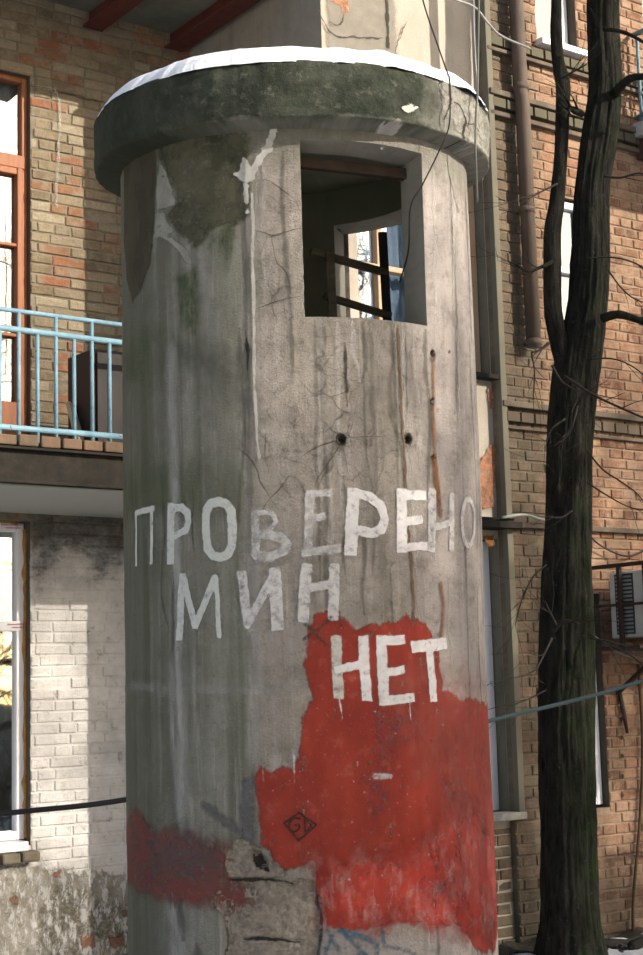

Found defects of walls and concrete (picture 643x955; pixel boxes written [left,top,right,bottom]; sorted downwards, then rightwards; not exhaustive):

peeling [153,162,192,264]
leakage [124,132,251,300]
leakage [164,466,180,587]
crack [243,331,251,371]
crack [304,344,352,480]
crack [397,328,407,489]
crack [407,513,415,624]
rust [432,367,442,516]
flaking render [480,444,496,509]
leakage [173,641,185,807]
flaking render [0,859,128,955]
spalling [216,838,329,955]